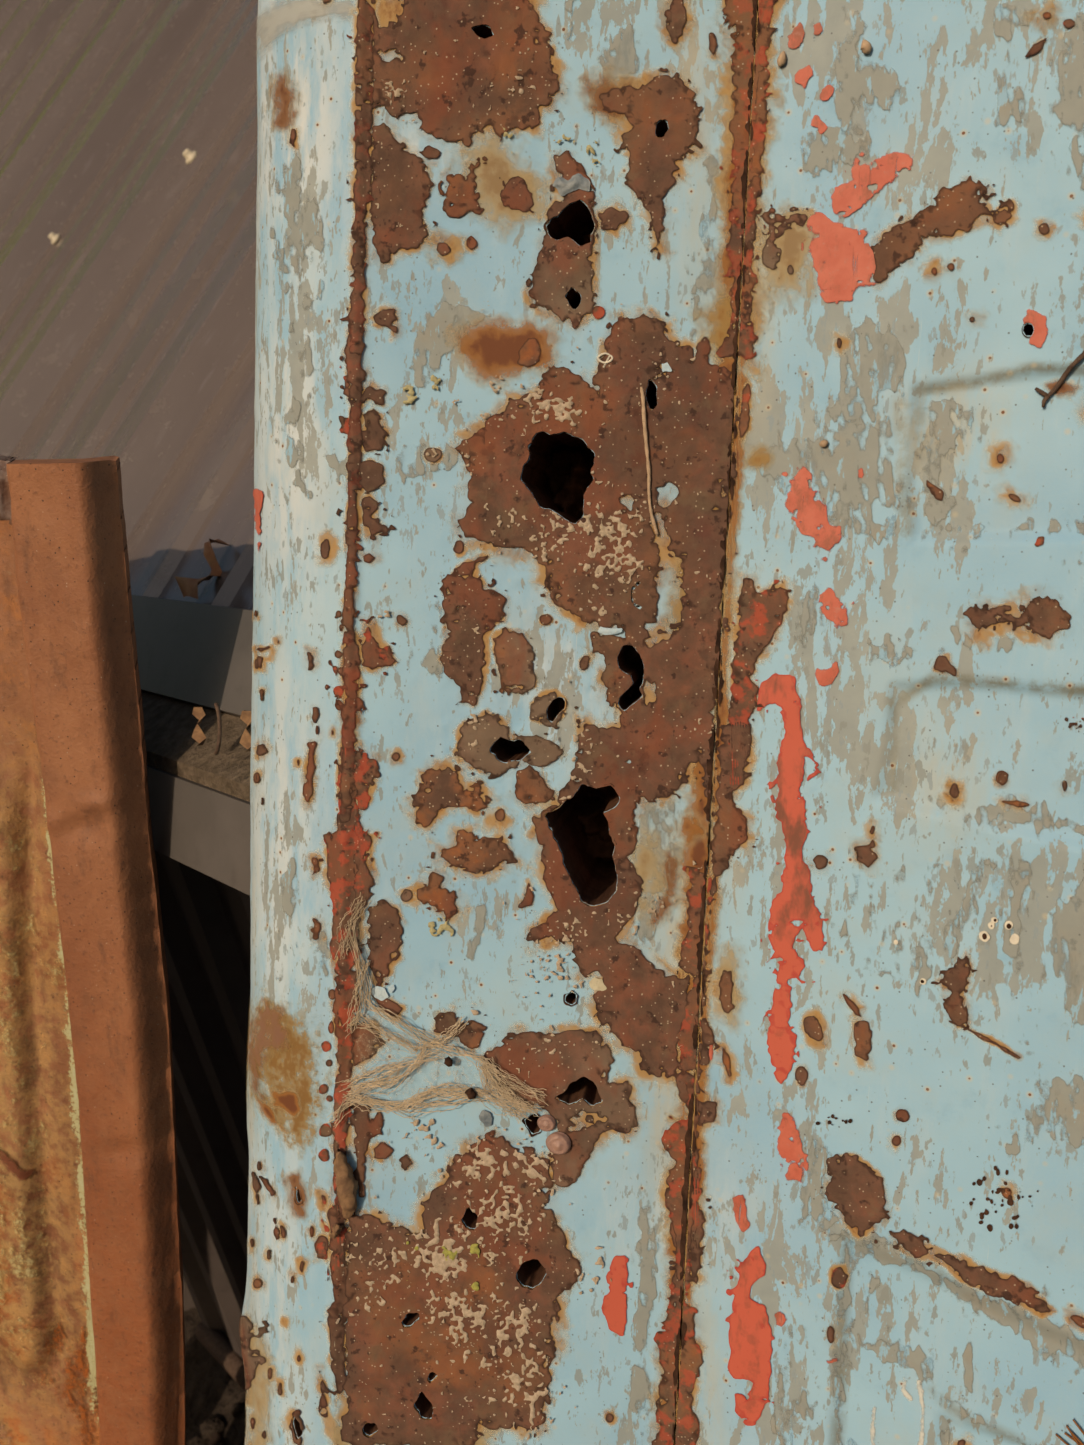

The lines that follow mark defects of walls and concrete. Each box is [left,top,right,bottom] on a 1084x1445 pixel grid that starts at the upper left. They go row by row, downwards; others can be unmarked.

peeling [795,11,913,304]
peeling [760,316,984,561]
corrosion [963,594,1071,647]
corrosion [239,0,818,1445]
peeling [755,673,847,1084]
corrosion [801,1010,827,1049]
corrosion [843,994,872,1067]
corrosion [931,956,1020,1059]
peeling [733,1195,750,1232]
peeling [725,1246,817,1445]
peeling [777,1113,1084,1445]
corrosion [820,1153,1084,1332]